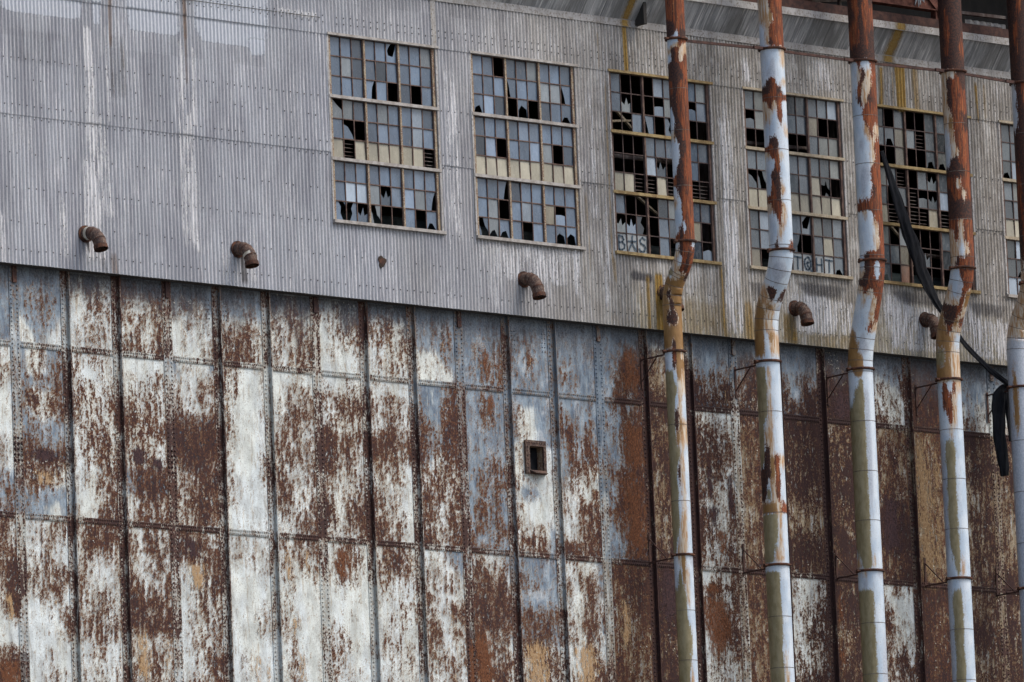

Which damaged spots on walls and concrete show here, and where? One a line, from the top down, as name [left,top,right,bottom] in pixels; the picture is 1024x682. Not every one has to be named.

rust [0,265,679,682]
rust [782,319,863,682]